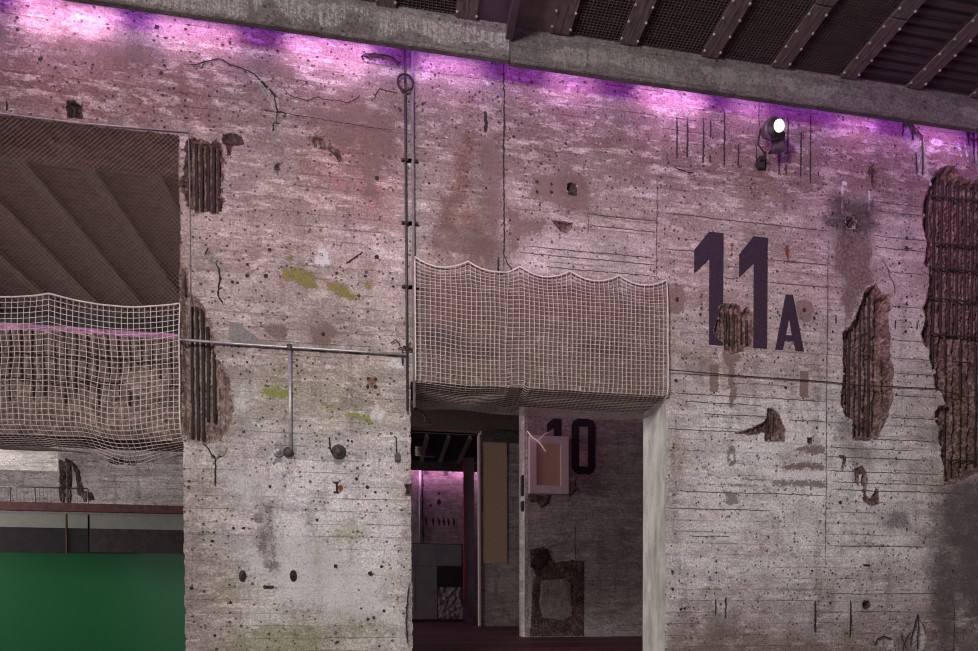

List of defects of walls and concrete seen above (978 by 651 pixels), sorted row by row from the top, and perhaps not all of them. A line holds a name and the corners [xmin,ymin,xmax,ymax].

crack [189,58,399,131]
spalling [178,133,244,217]
spalling [179,258,235,445]
spalling [714,303,753,354]
spalling [735,407,786,443]
water stain [828,181,874,322]
spalling [835,283,896,443]
spalling [902,123,978,486]